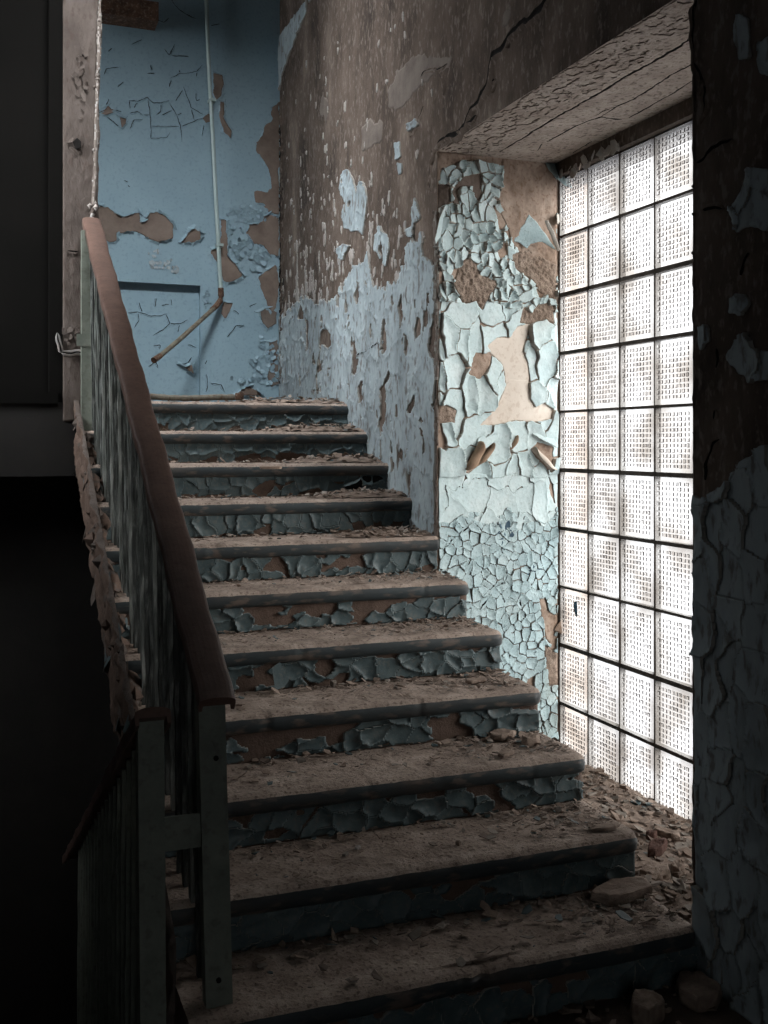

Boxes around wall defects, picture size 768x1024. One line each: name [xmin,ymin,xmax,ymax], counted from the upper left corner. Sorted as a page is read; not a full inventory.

crack [99,39,205,142]
crack [409,0,551,165]
peeling [72,0,695,542]
peeling [197,550,460,588]
peeling [209,596,488,645]
peeling [225,645,528,711]
crack [438,472,559,739]
spalling [539,598,570,686]
peeling [226,708,568,789]